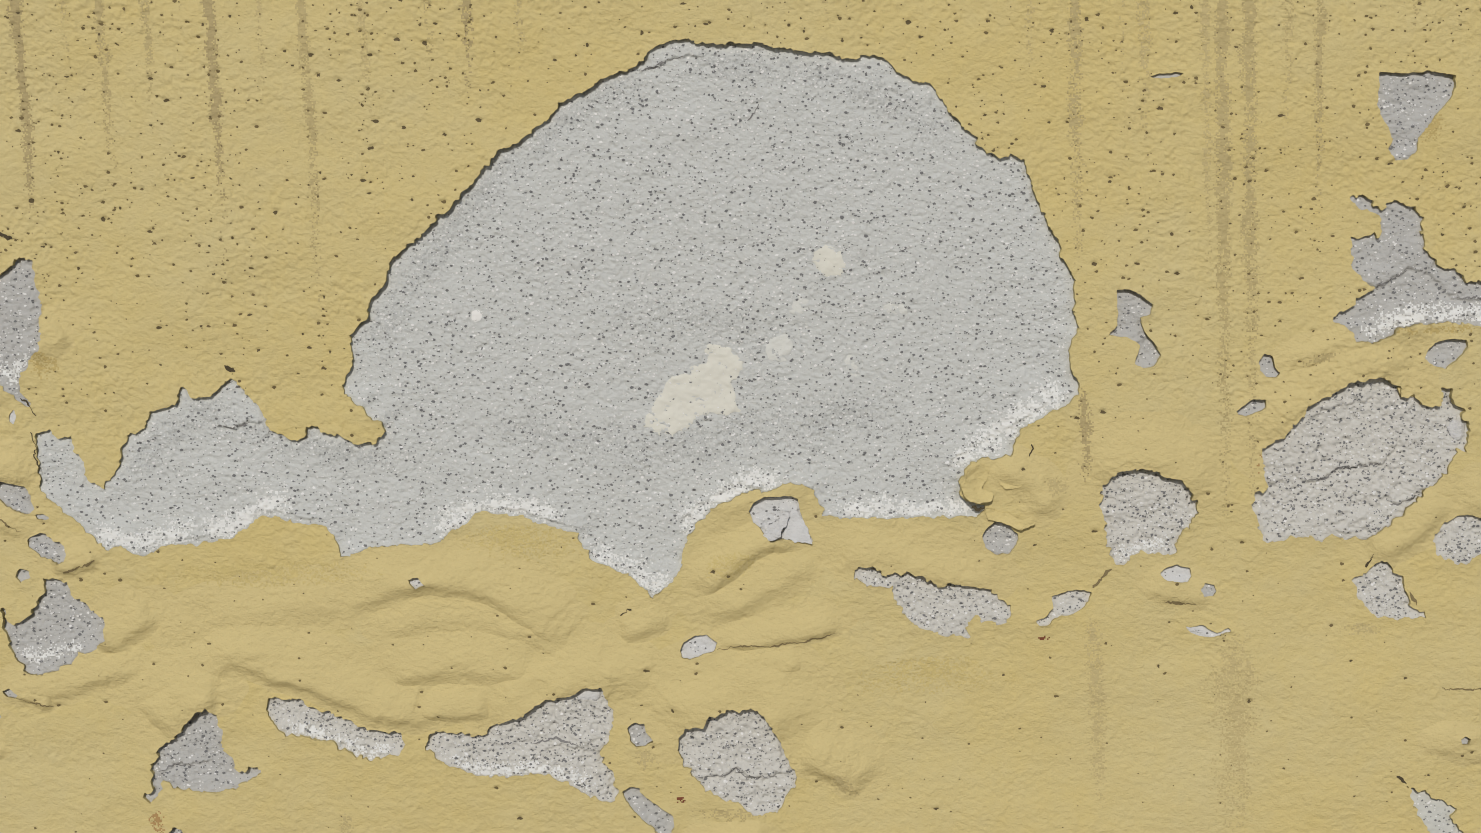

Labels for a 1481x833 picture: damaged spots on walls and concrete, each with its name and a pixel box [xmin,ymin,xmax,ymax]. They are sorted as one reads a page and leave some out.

peeling [1377,70,1454,165]
peeling [1333,195,1481,369]
peeling [0,23,1080,675]
peeling [1252,377,1468,543]
peeling [1091,469,1216,597]
peeling [1036,590,1091,626]
peeling [145,709,261,802]
peeling [267,697,405,761]
peeling [426,688,674,833]
peeling [678,709,797,816]
peeling [1410,774,1463,833]